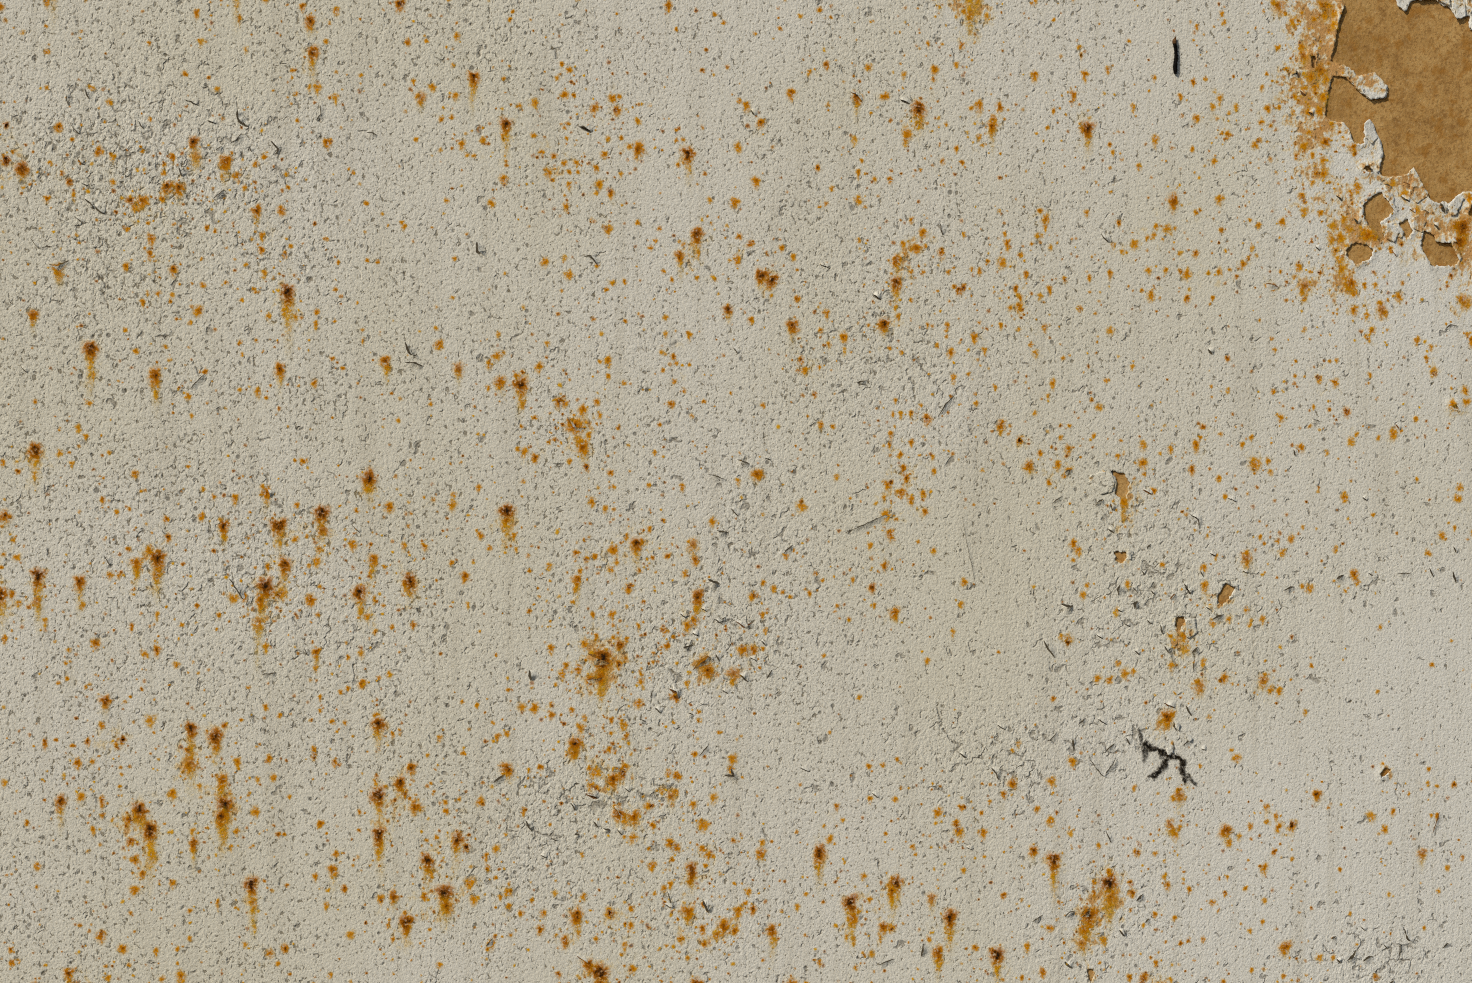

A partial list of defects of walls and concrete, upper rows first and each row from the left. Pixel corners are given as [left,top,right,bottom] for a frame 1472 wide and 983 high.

rust [194,0,252,51]
peeling [1308,0,1472,267]
rust [418,326,461,376]
crack [1054,461,1153,533]
peeling [1089,471,1130,499]
crack [963,517,977,586]
crack [1284,586,1295,595]
crack [1044,495,1249,785]
crack [960,750,1002,780]
rust [1366,738,1472,897]